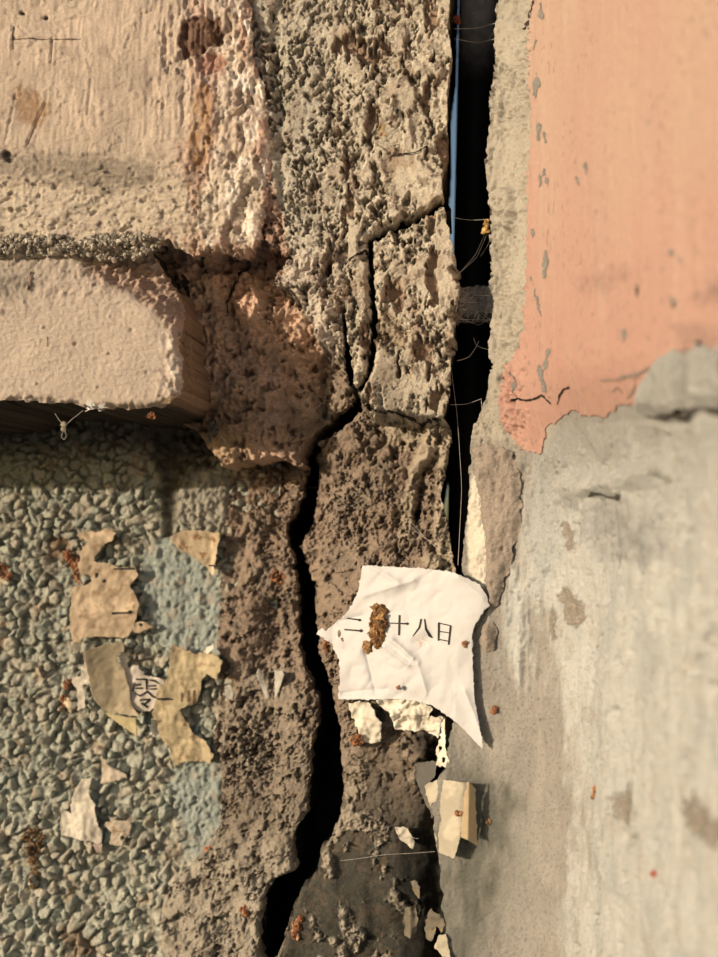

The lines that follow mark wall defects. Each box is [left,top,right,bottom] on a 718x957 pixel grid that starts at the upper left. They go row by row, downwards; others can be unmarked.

crack [522,1,534,30]
crack [392,143,429,157]
peeling [536,349,550,398]
crack [261,200,452,957]